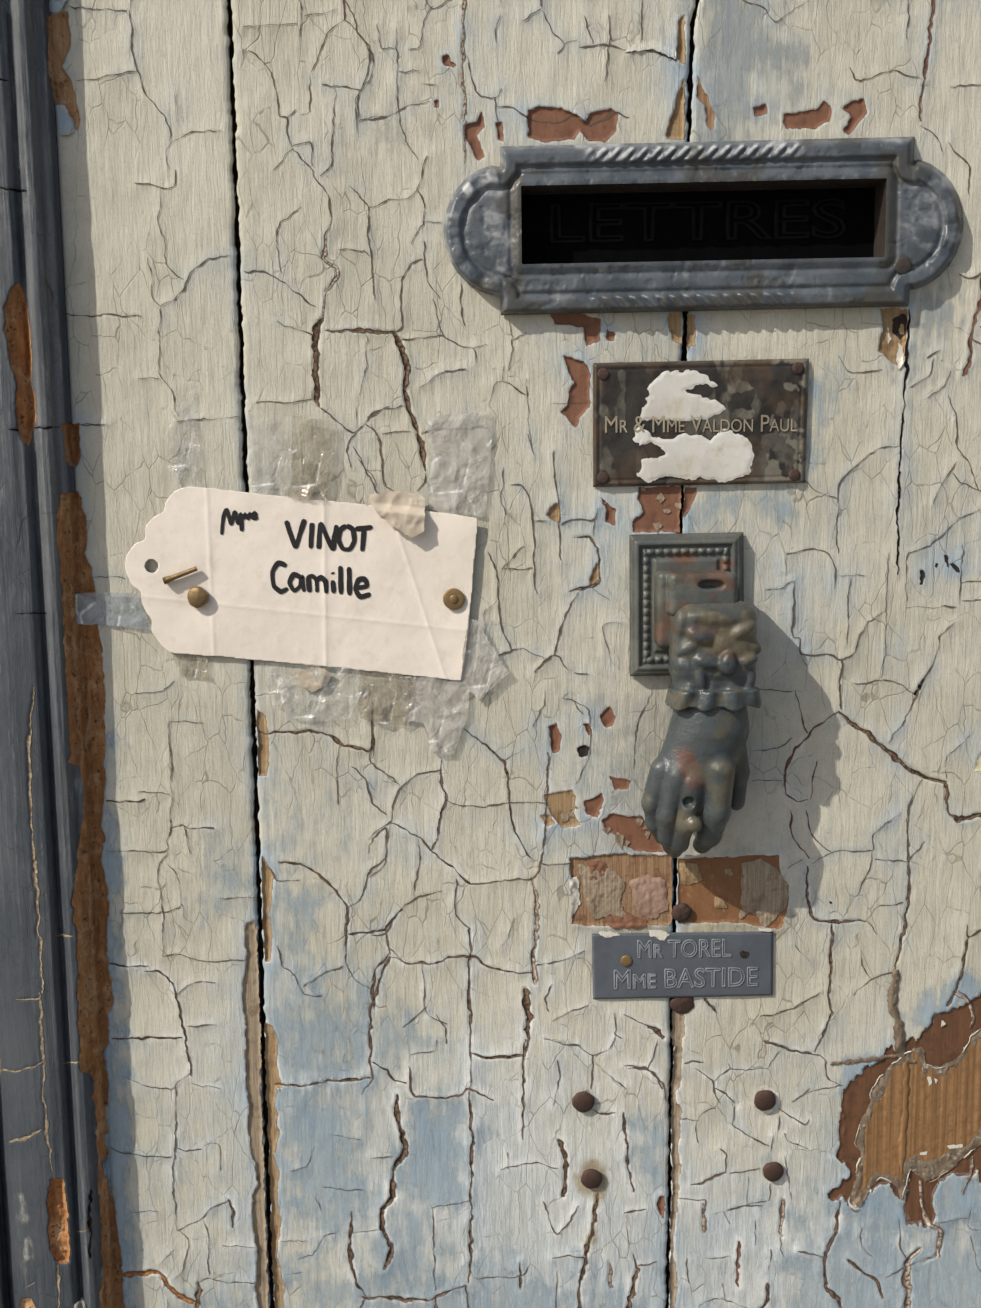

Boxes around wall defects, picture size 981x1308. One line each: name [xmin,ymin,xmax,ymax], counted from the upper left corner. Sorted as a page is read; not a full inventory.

crack [495,0,677,81]
crack [743,0,806,22]
peeling [465,112,503,160]
peeling [527,106,618,142]
peeling [783,98,867,135]
crack [850,0,981,195]
crack [45,0,629,675]
peeling [550,314,615,427]
peeling [540,776,663,853]
crack [258,273,981,1308]
crack [105,721,256,1308]
peeling [827,969,981,1257]